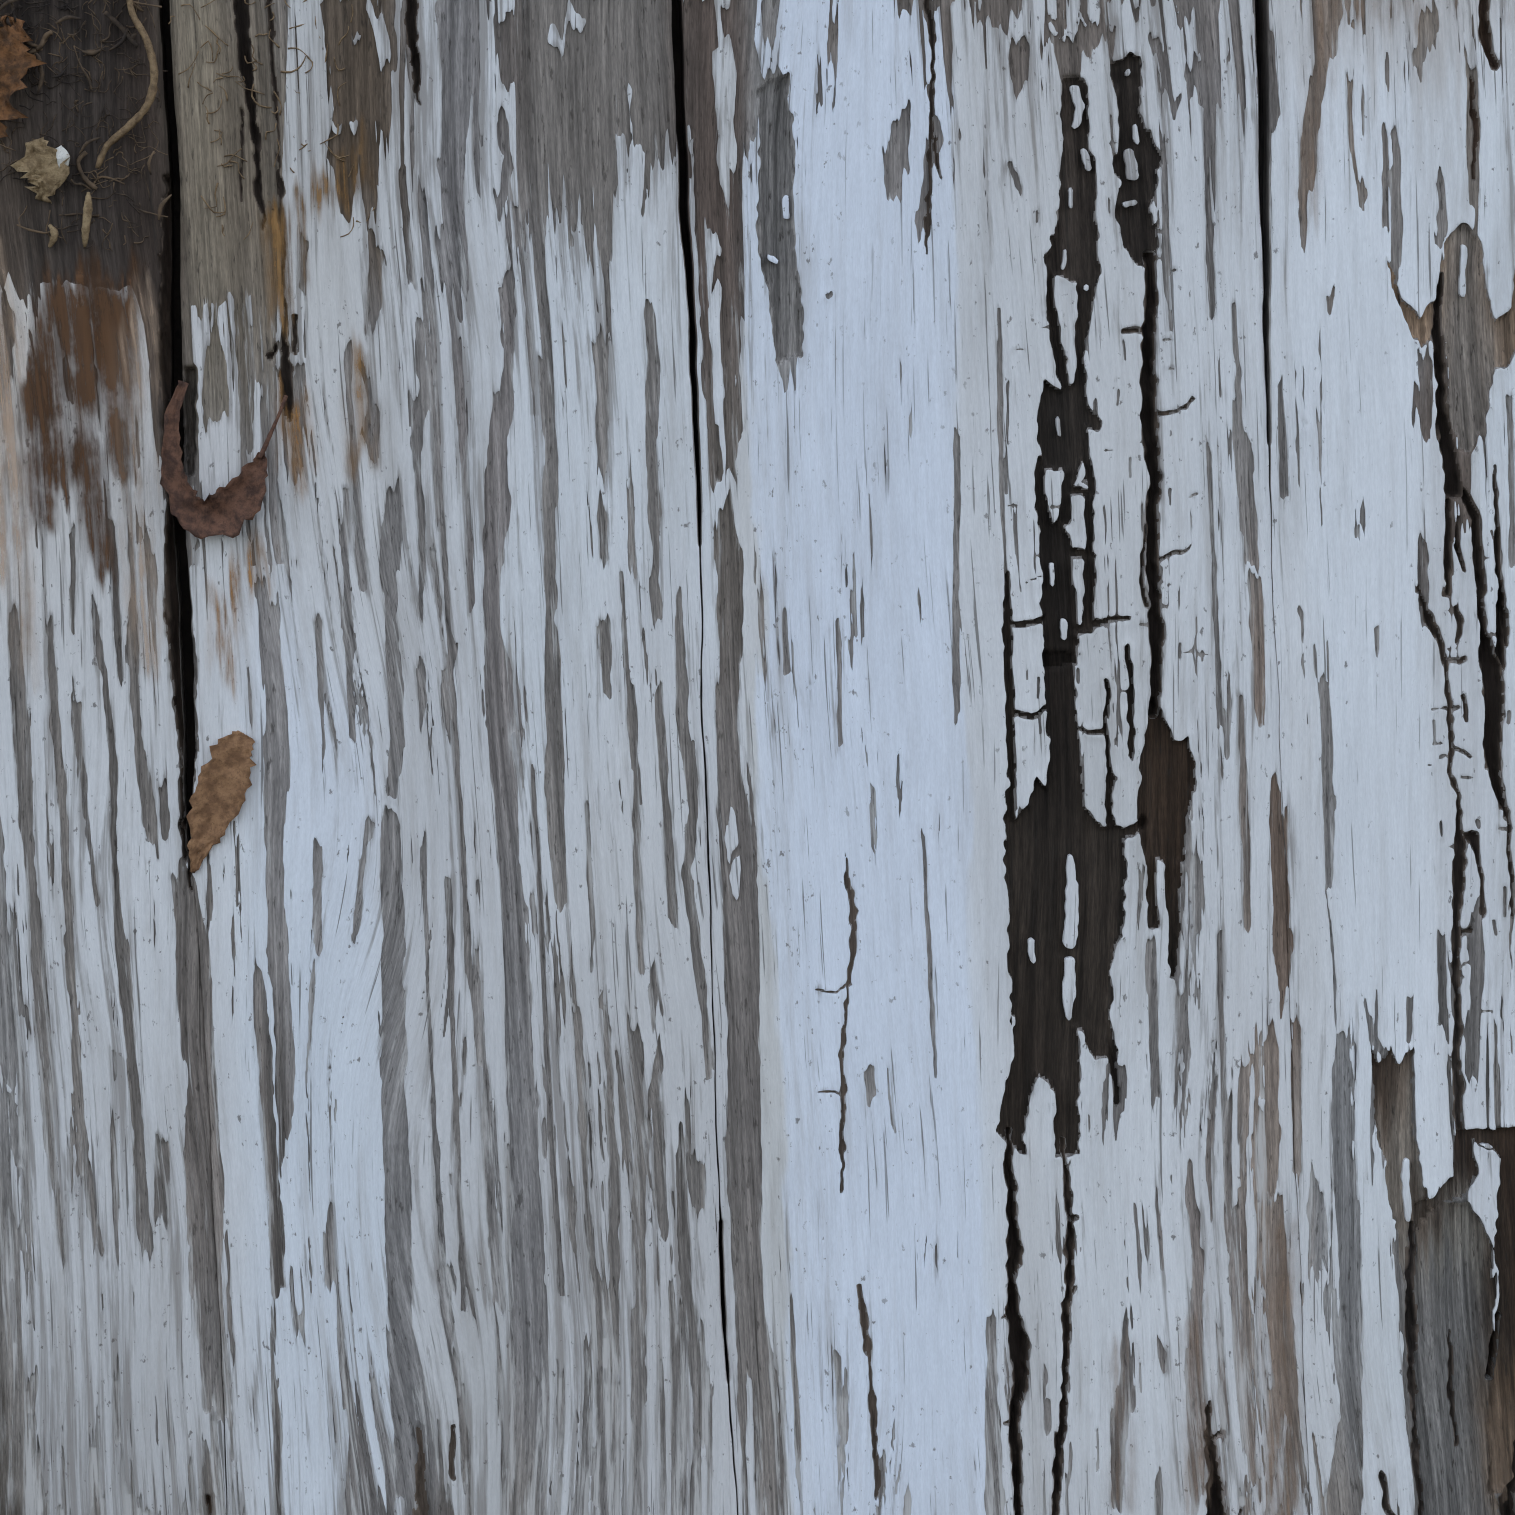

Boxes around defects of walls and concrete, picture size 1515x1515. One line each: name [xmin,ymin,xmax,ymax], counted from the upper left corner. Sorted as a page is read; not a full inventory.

crack [157,177,171,450]
peeling [755,74,804,364]
crack [163,489,193,890]
peeling [996,54,1195,1154]
crack [1416,273,1514,1130]
crack [1002,1126,1079,1515]
peeling [1371,1049,1515,1515]